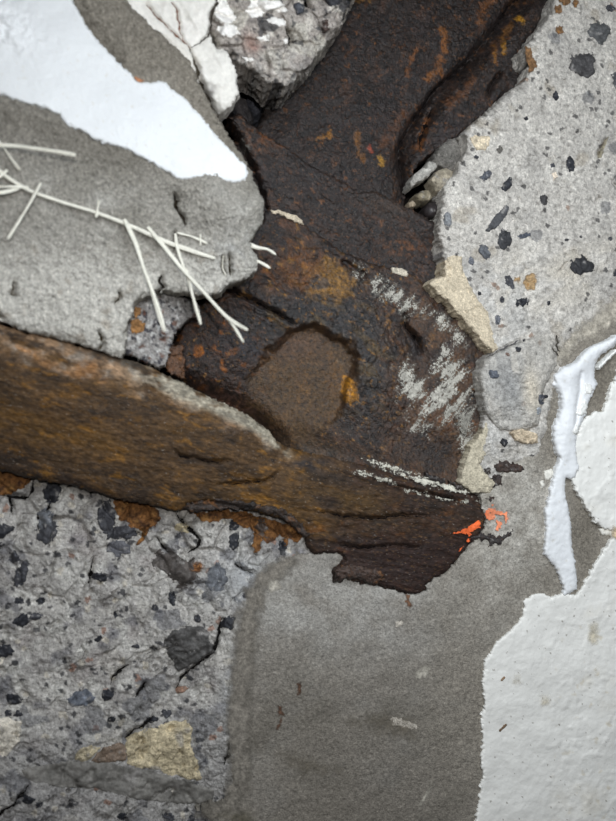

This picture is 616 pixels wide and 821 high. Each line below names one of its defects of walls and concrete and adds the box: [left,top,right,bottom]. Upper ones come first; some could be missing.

spalling [127,0,355,122]
peeling [0,0,248,183]
rust [130,307,146,334]
spalling [429,0,616,821]
rust [0,472,31,496]
rust [113,499,161,545]
crack [157,503,201,553]
rust [194,508,302,553]
crack [110,664,129,685]
spalling [0,478,311,821]
crack [175,618,223,689]
crack [125,716,153,738]